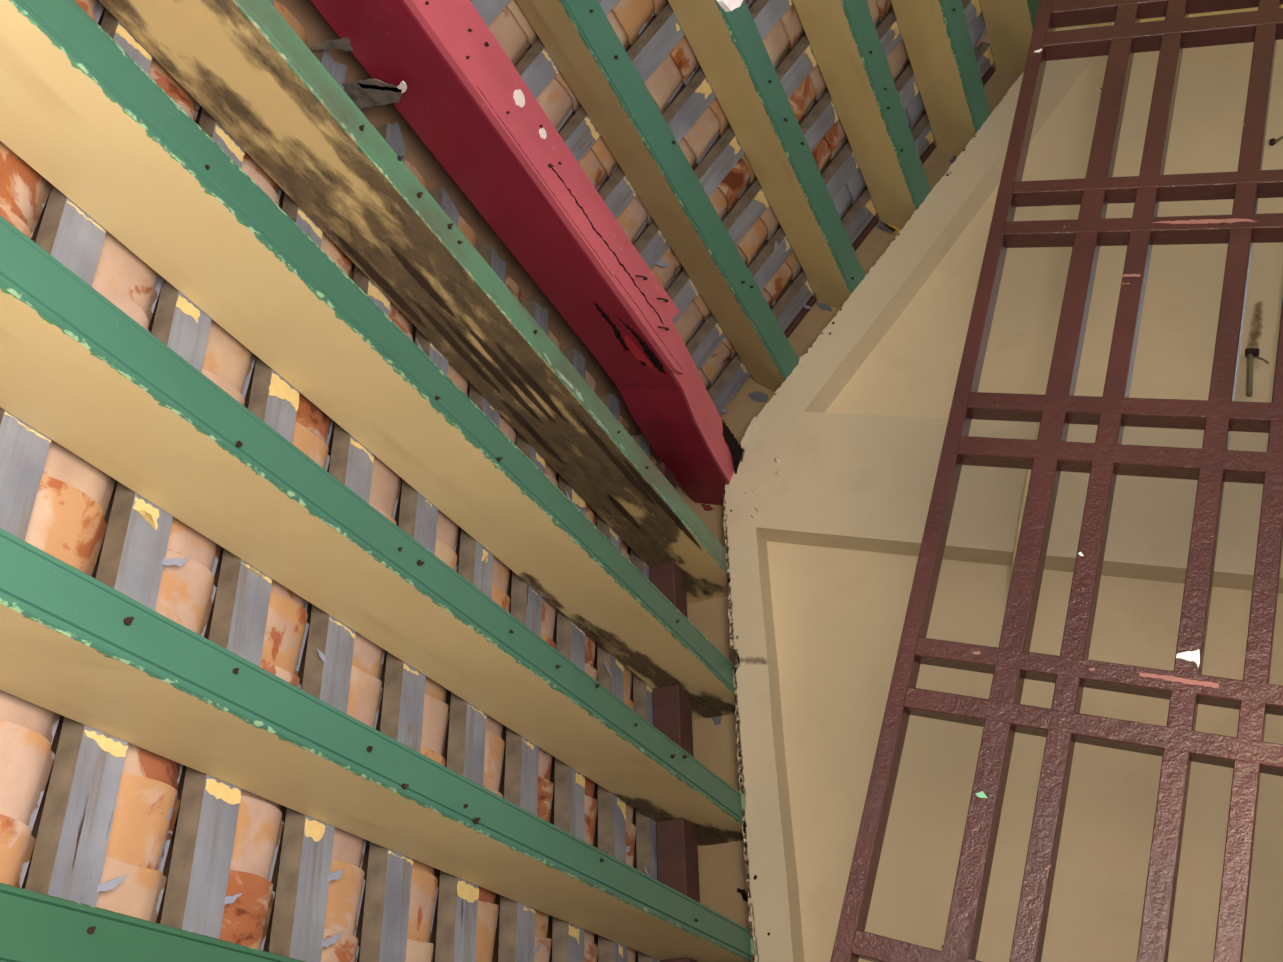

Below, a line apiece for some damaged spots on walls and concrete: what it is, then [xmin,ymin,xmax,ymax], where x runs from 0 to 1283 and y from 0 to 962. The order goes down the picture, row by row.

leakage [98,0,141,32]
crack [477,86,682,369]
peeling [624,335,658,373]
leakage [151,0,755,962]
peeling [1140,650,1219,688]